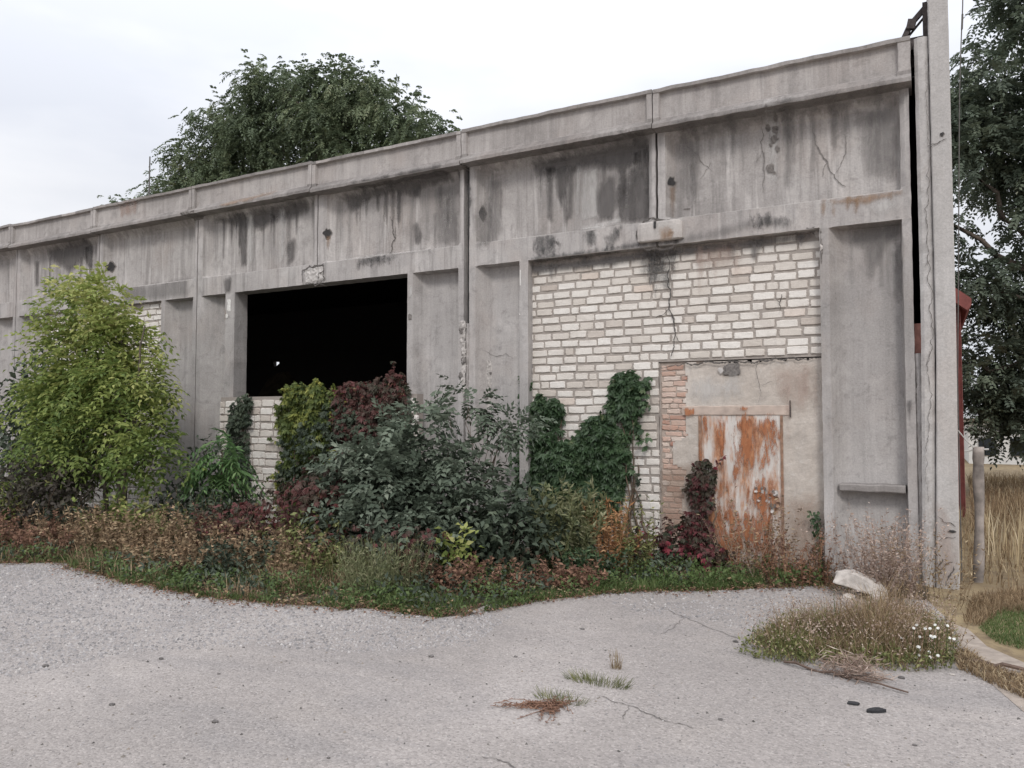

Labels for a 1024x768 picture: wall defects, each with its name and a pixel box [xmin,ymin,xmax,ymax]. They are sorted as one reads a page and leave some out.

water stain [223,198,308,264]
water stain [346,166,460,219]
water stain [532,133,808,287]
crack [757,117,765,189]
peeling [765,104,780,175]
crack [812,129,847,187]
crack [636,217,819,402]
spalling [458,320,467,396]
rust [685,407,781,567]